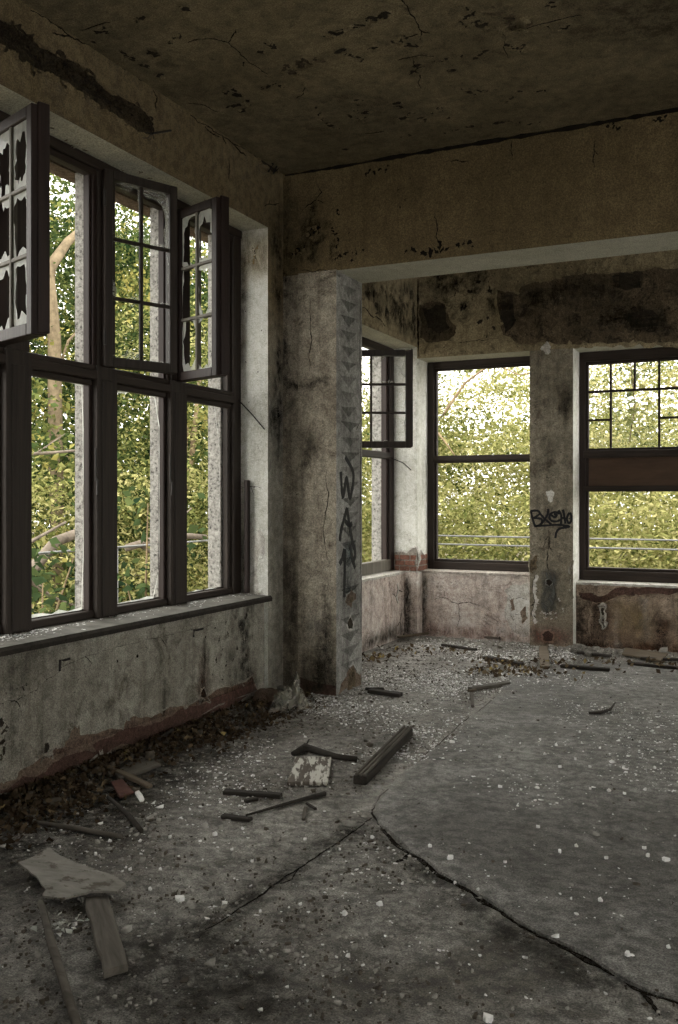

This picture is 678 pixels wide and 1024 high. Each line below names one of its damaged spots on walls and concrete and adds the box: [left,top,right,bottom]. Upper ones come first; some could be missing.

flaking render [0,16,155,138]
crack [265,107,678,214]
leakage [437,270,495,309]
leakage [284,567,336,694]
flaking render [394,546,428,575]
peeling [503,553,678,644]
peeling [0,611,258,795]
crack [419,691,500,762]
crack [205,789,678,1016]